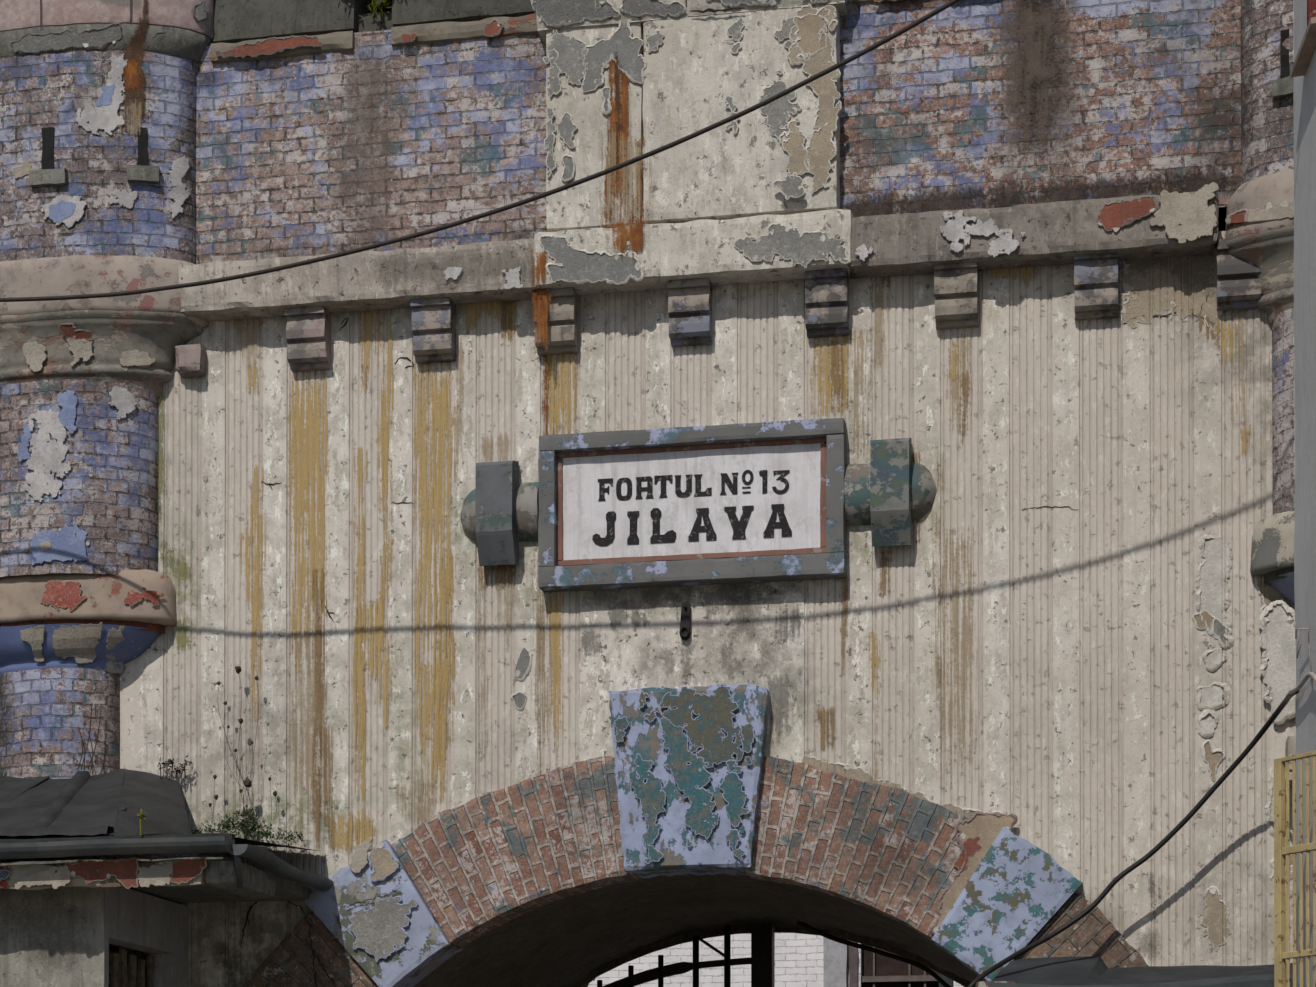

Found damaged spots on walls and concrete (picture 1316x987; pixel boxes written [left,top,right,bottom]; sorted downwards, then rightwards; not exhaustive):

corrosion [120,0,149,136]
spalling [531,0,686,182]
corrosion [599,52,651,262]
flaking render [758,0,842,200]
water stain [1002,0,1069,167]
spalling [539,234,644,285]
peeling [734,223,849,268]
peeling [20,579,125,664]
spalling [1256,578,1295,613]
peeling [629,683,755,864]
peeling [0,857,207,890]
spalling [349,837,418,962]